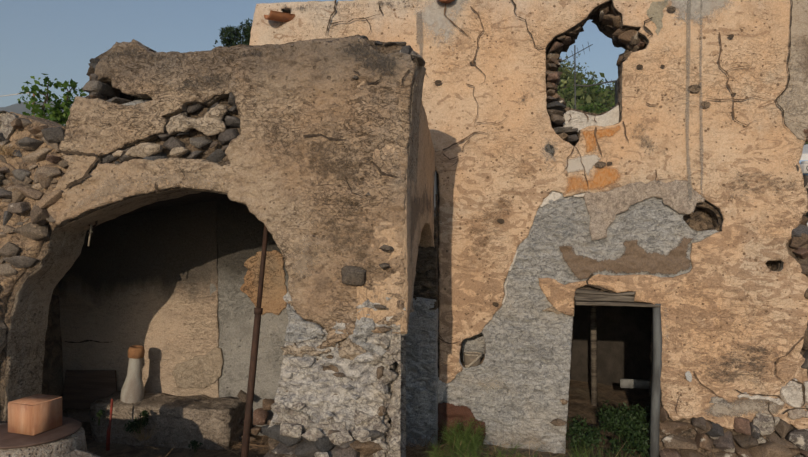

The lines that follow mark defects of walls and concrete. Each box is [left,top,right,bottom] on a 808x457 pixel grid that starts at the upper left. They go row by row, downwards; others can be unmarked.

spalling [101,92,241,165]
crack [326,0,383,34]
crack [443,3,509,167]
crack [511,0,545,49]
flaking render [546,6,643,105]
crack [709,0,801,140]
spalling [268,292,406,443]
spalling [438,180,721,457]